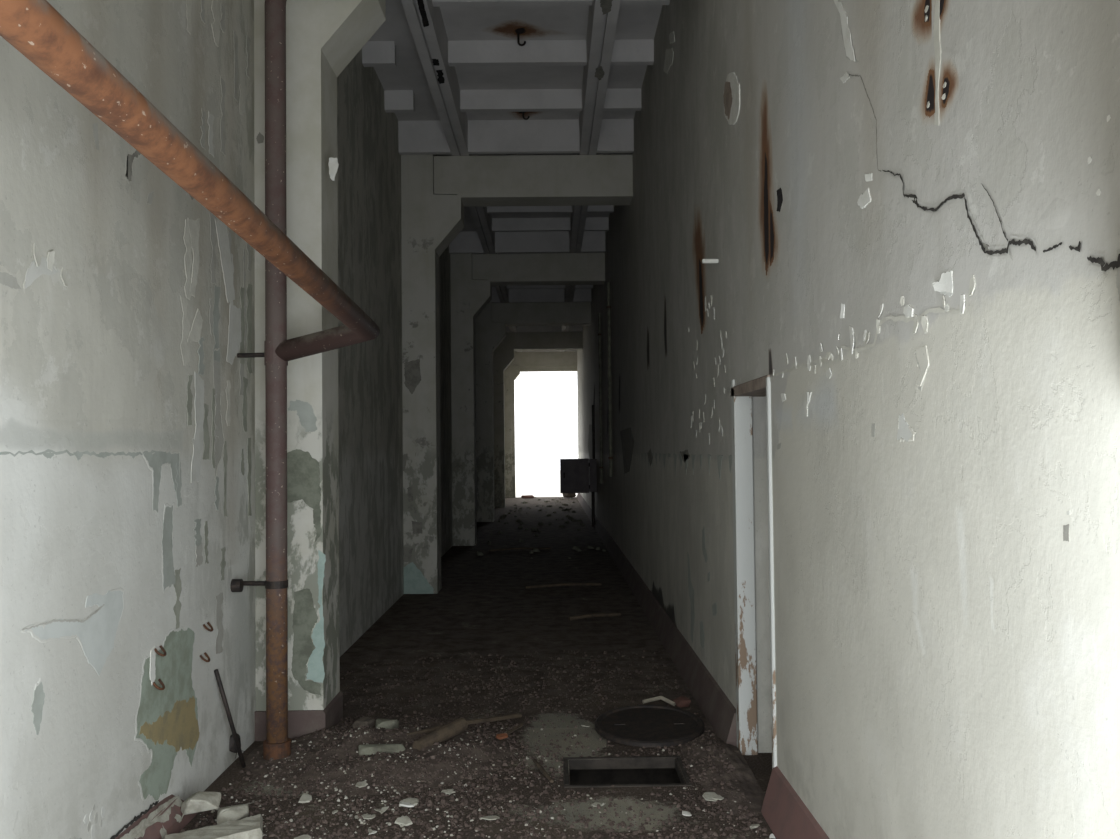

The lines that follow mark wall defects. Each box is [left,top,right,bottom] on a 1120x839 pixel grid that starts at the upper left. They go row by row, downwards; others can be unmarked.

corrosion [473,17,578,40]
corrosion [755,60,784,294]
corrosion [908,0,962,137]
crack [833,0,1120,278]
corrosion [690,188,709,348]
peeling [691,295,727,444]
peeling [804,391,812,417]
peeling [773,270,976,391]
peeling [120,211,253,839]
peeling [287,449,326,696]
peeling [404,562,434,594]
peeling [31,677,45,735]